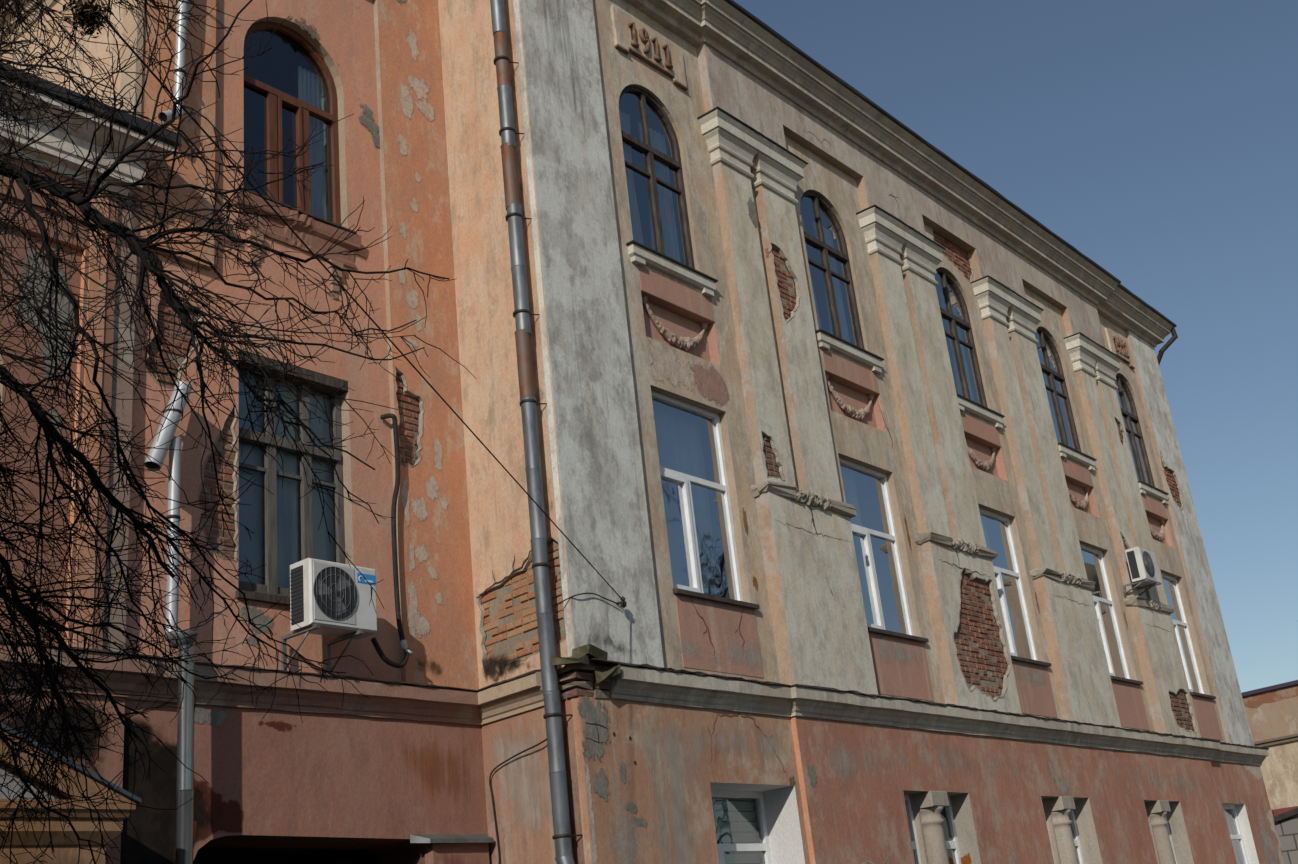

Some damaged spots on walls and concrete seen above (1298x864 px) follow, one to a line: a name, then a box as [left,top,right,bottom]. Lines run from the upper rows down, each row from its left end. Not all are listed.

peeling [747,197,757,228]
spalling [765,241,800,325]
spalling [198,405,240,562]
peeling [394,366,449,641]
spalling [761,430,786,481]
spalling [478,536,566,667]
spalling [952,567,1011,702]
spalling [1168,687,1197,733]